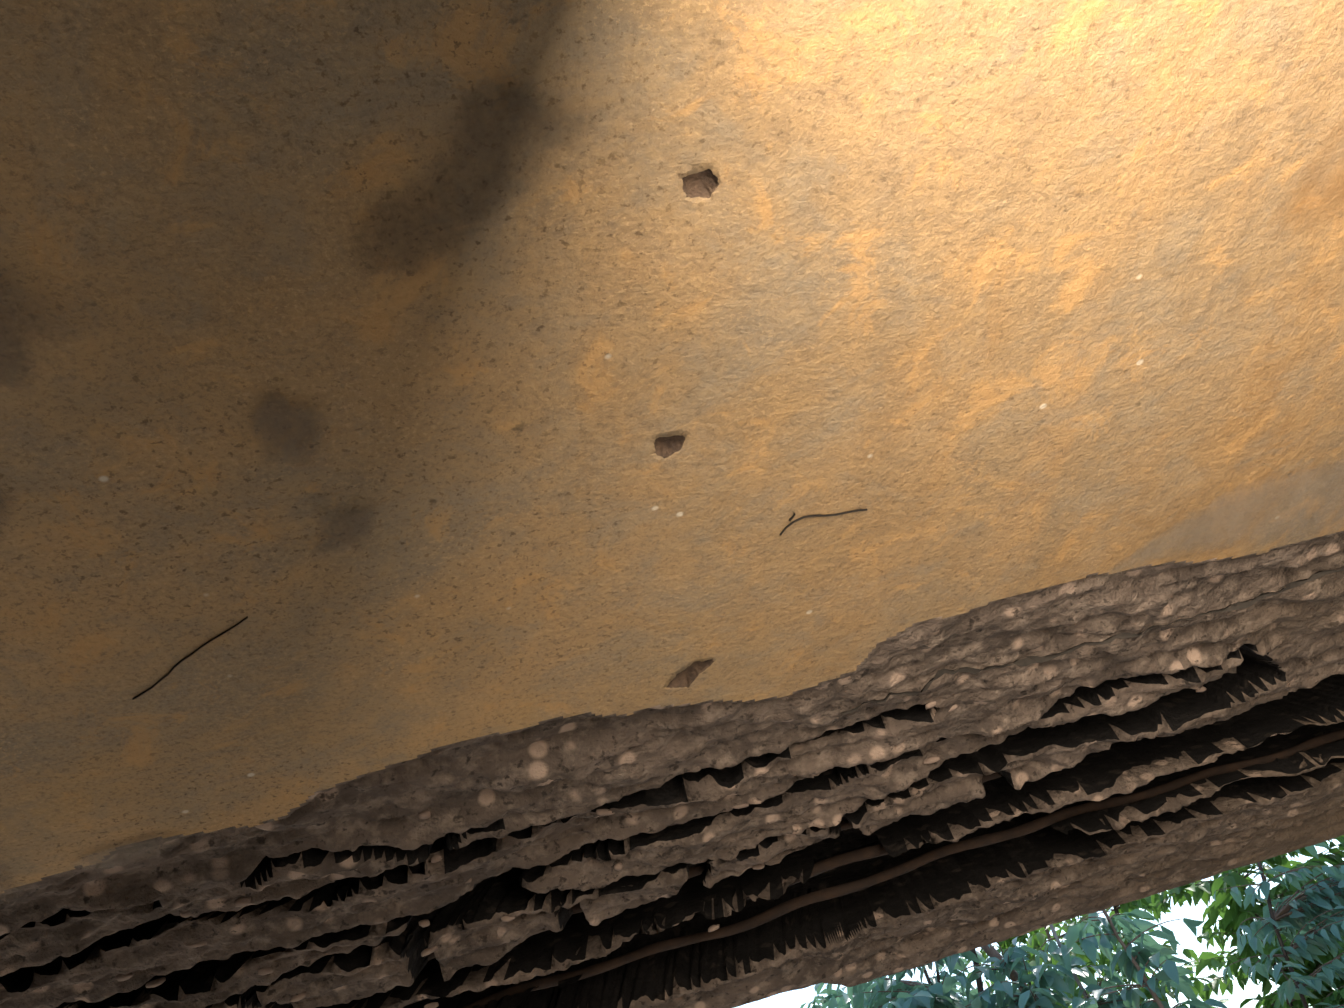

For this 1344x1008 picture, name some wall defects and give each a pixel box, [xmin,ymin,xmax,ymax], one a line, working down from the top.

spalling [0,531,1344,1008]